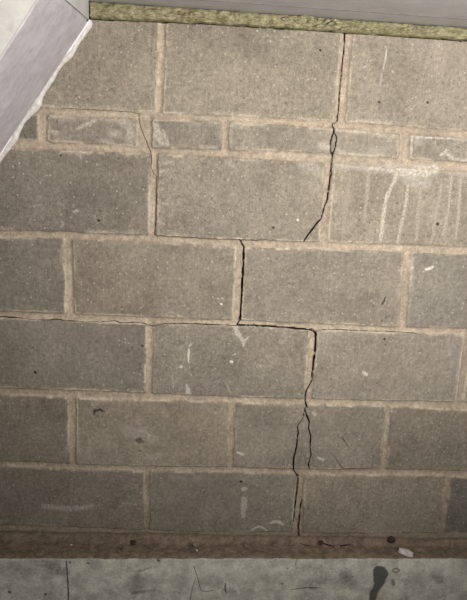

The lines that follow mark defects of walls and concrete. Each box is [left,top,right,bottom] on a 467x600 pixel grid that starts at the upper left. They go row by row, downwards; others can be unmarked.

crack [66,108,157,205]
crack [293,34,345,242]
crack [0,221,421,547]